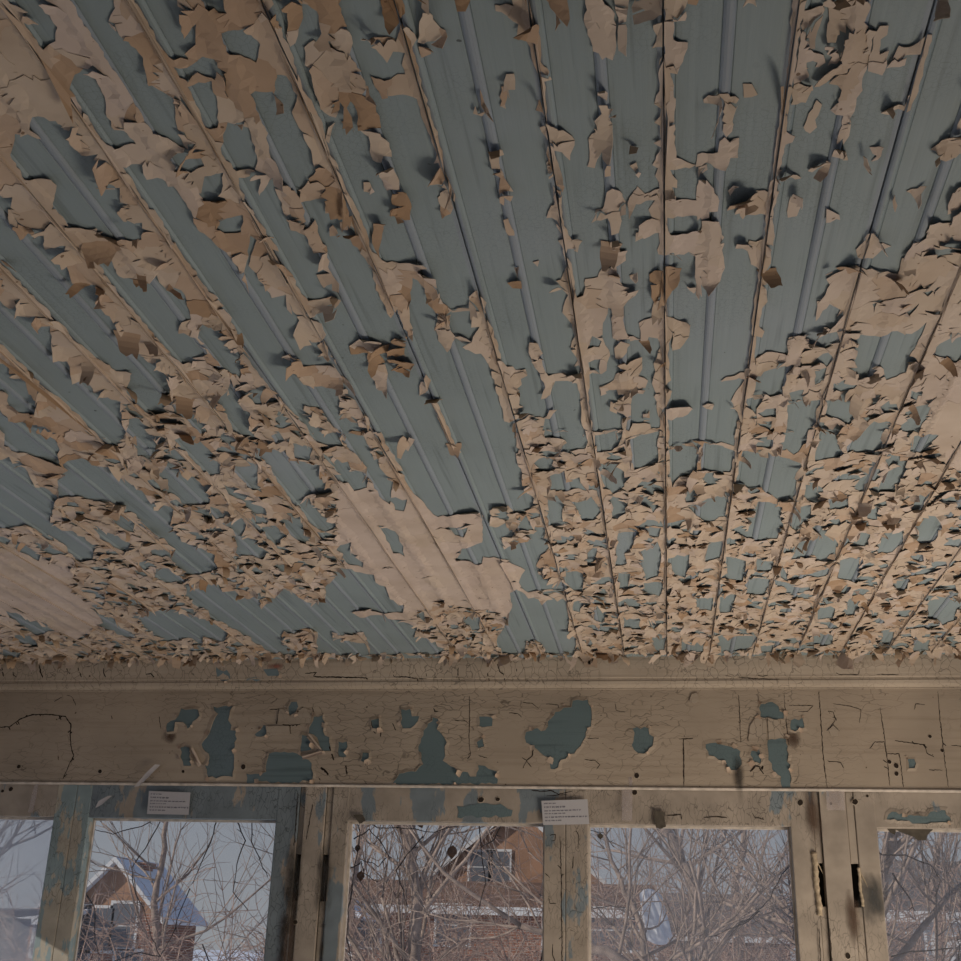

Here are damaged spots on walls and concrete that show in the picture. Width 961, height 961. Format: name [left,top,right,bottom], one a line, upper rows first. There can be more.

crack [0,668,106,778]
peeling [163,699,372,784]
peeling [392,704,501,785]
peeling [521,695,596,772]
peeling [628,723,658,757]
peeling [702,699,808,788]
crack [725,675,961,787]
peeling [884,807,954,828]